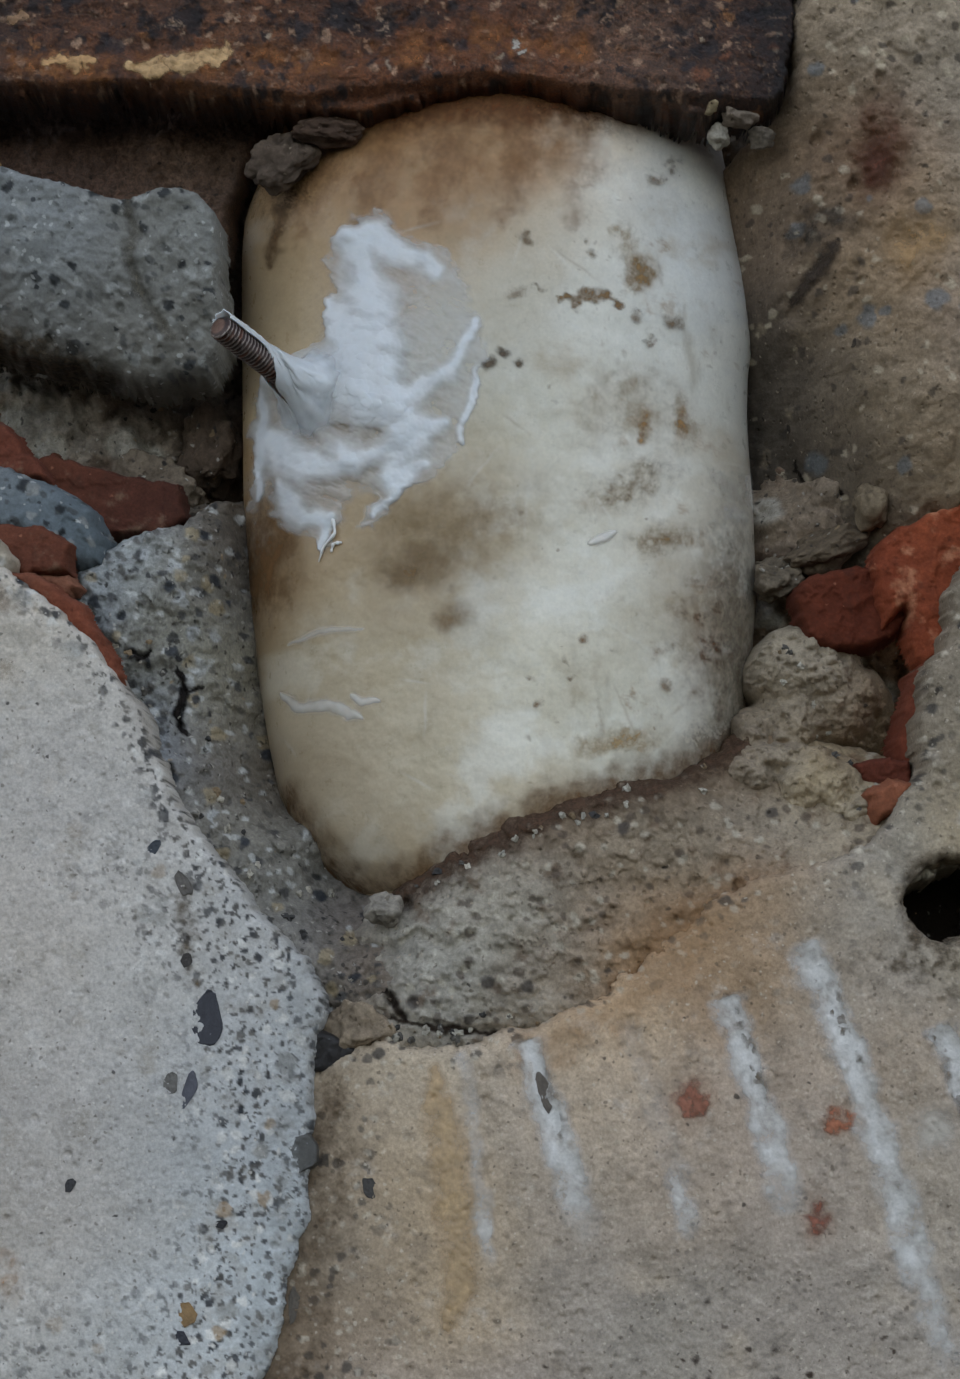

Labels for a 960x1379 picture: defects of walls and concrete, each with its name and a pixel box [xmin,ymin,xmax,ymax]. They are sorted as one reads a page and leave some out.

corrosion [368,94,606,128]
damp [266,188,296,268]
damp [248,512,294,613]
crack [124,649,205,736]